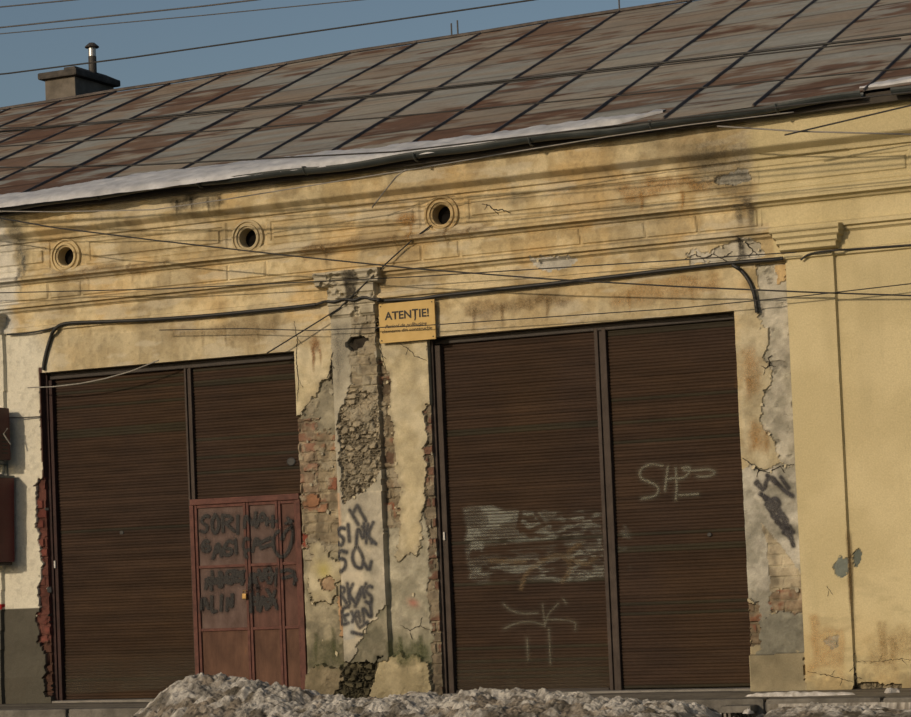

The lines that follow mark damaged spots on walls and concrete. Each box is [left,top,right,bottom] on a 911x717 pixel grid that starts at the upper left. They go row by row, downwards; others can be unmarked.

crack [685,237,759,261]
spalling [35,478,54,696]
spalling [297,314,443,698]
peeling [686,236,802,646]
peeling [832,547,863,577]
crack [807,653,910,689]